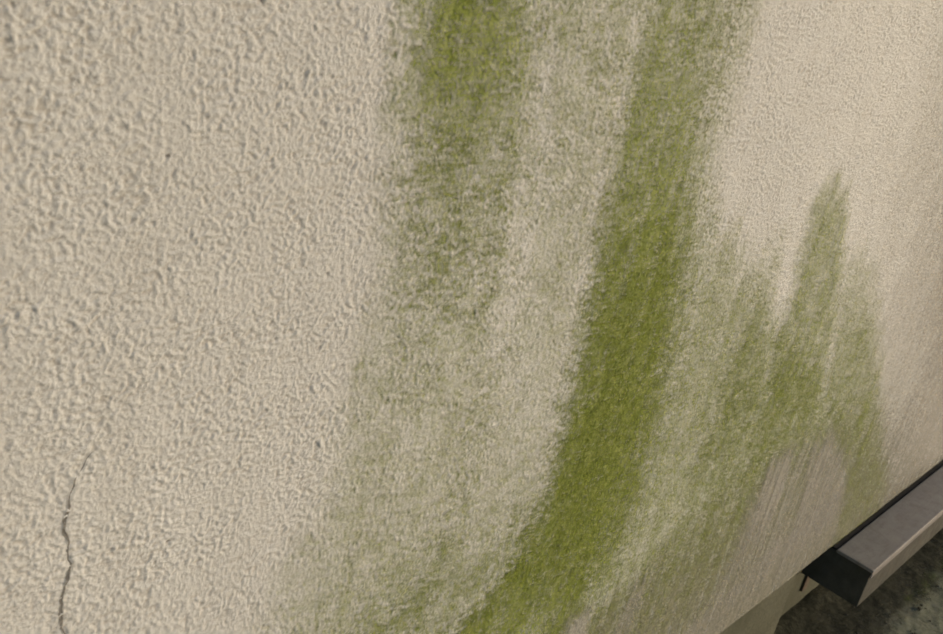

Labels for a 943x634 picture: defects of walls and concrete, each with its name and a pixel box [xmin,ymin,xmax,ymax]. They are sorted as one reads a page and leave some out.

leakage [547,0,635,113]
leakage [314,230,943,634]
crack [59,451,94,634]